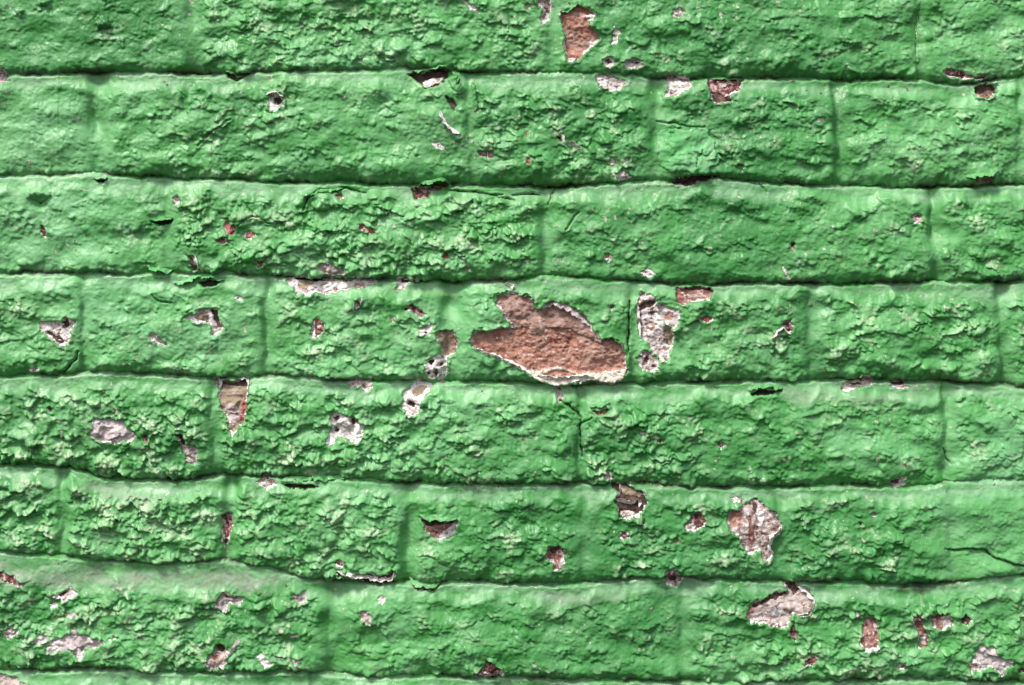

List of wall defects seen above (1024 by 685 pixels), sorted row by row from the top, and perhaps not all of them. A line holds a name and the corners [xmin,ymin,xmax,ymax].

peeling [525,0,643,91]
peeling [286,262,378,309]
peeling [391,304,457,418]
peeling [470,282,713,403]
peeling [89,418,148,445]
peeling [213,376,250,438]
peeling [325,411,365,446]
peeling [604,470,648,541]
peeling [727,495,783,565]
peeling [34,587,117,661]
peeling [746,581,816,642]
peeling [969,645,1024,677]